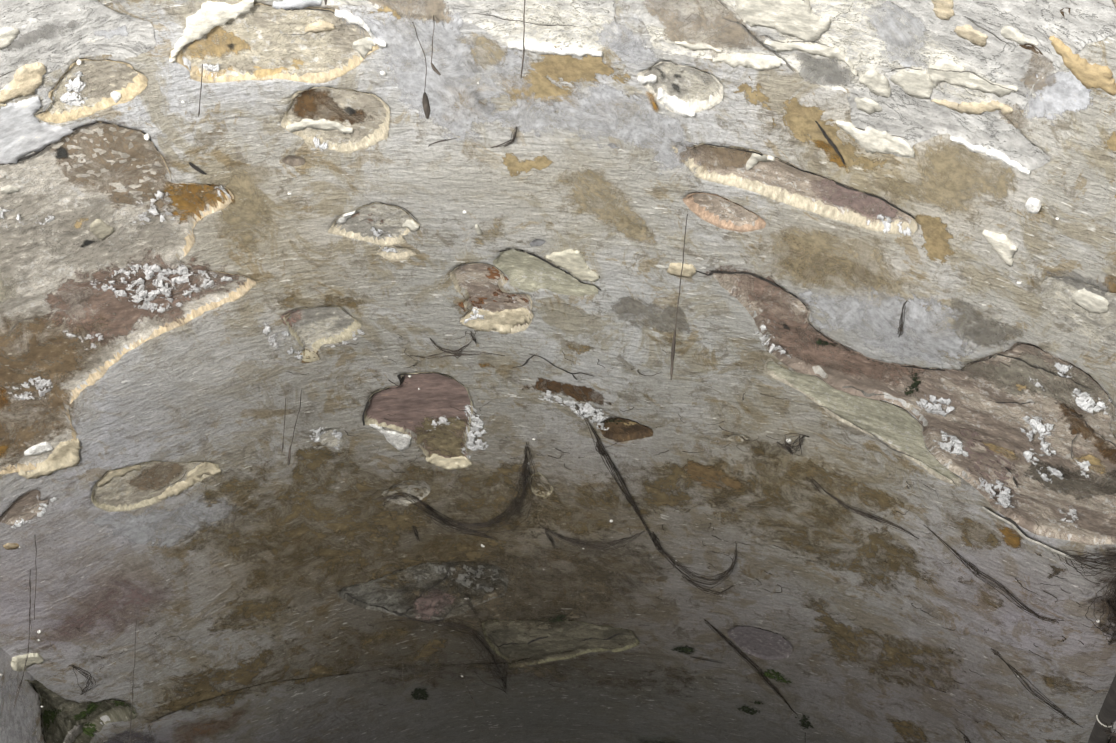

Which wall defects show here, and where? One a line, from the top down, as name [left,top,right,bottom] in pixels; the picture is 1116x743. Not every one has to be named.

peeling [169,0,1116,175]
flaking render [0,0,256,529]
flaking render [328,203,420,261]
flaking render [449,239,600,334]
flaking render [670,143,918,237]
flaking render [281,306,365,363]
flaking render [362,372,488,470]
flaking render [598,418,653,442]
flaking render [667,263,1116,545]
damp [156,435,934,743]
damp [805,599,966,691]
flaking render [11,653,138,743]